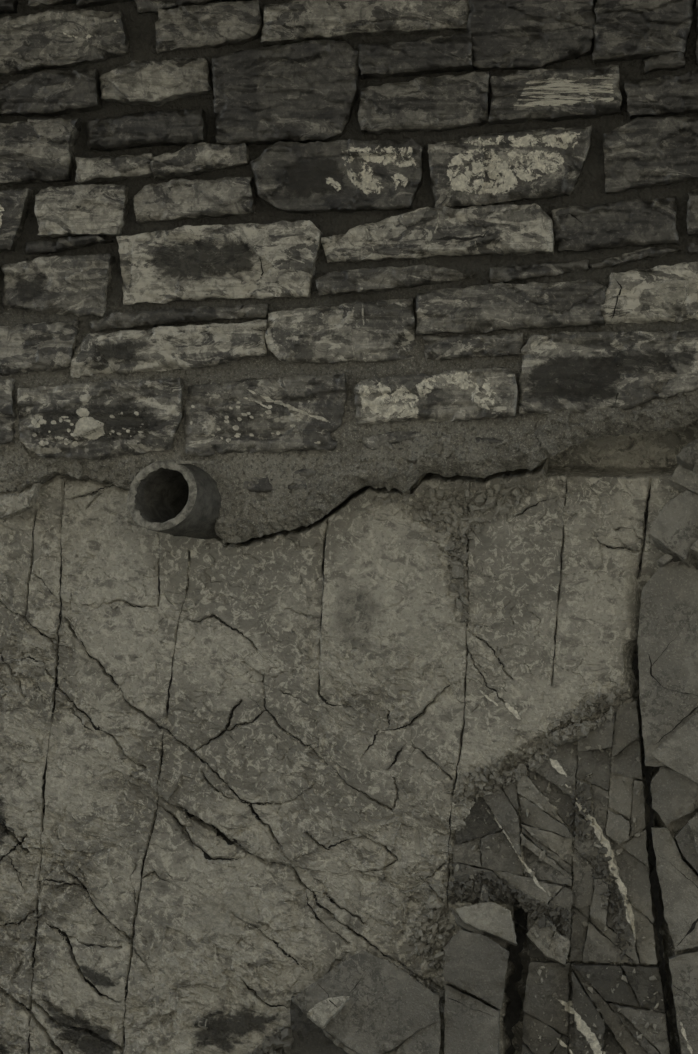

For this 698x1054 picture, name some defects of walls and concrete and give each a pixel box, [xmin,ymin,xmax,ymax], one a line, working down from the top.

crack [516,480,567,677]
crack [597,484,651,575]
crack [0,514,527,1054]
spalling [452,886,571,967]
crack [632,616,698,1054]